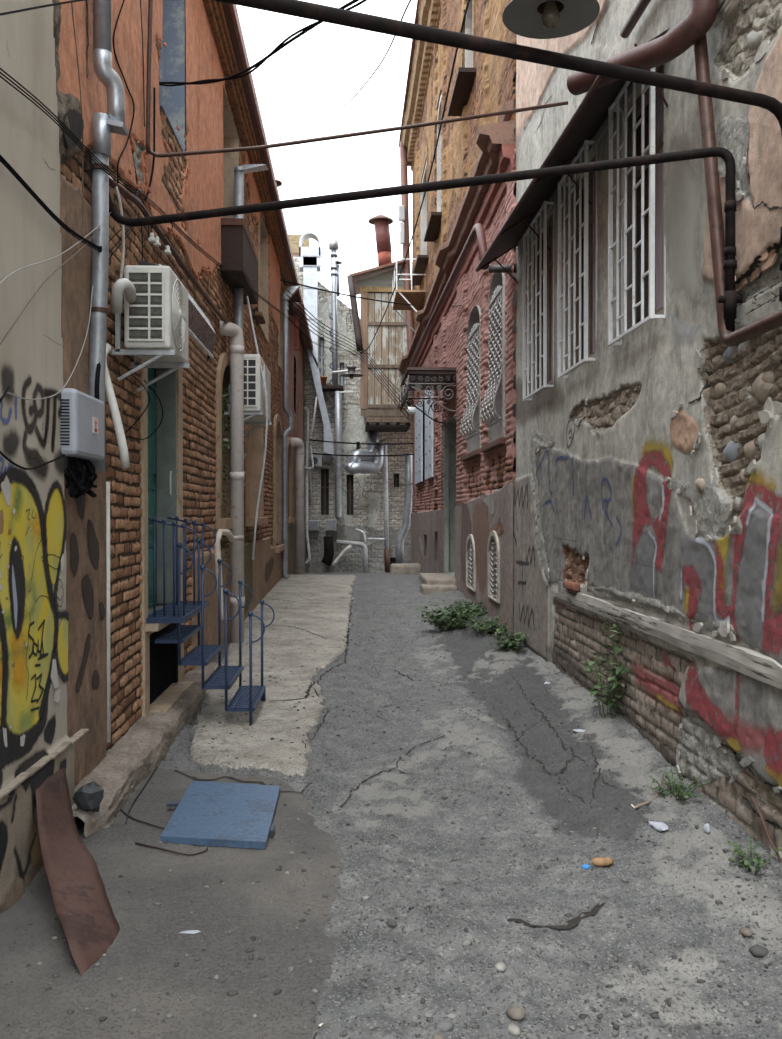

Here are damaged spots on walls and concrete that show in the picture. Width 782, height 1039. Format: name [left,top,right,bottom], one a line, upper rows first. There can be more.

flaking render [714,0,782,81]
flaking render [715,116,750,201]
flaking render [735,242,782,325]
flaking render [570,384,641,436]
flaking render [665,326,782,542]
flaking render [529,429,554,587]
flaking render [563,545,737,641]
crack [500,676,617,804]